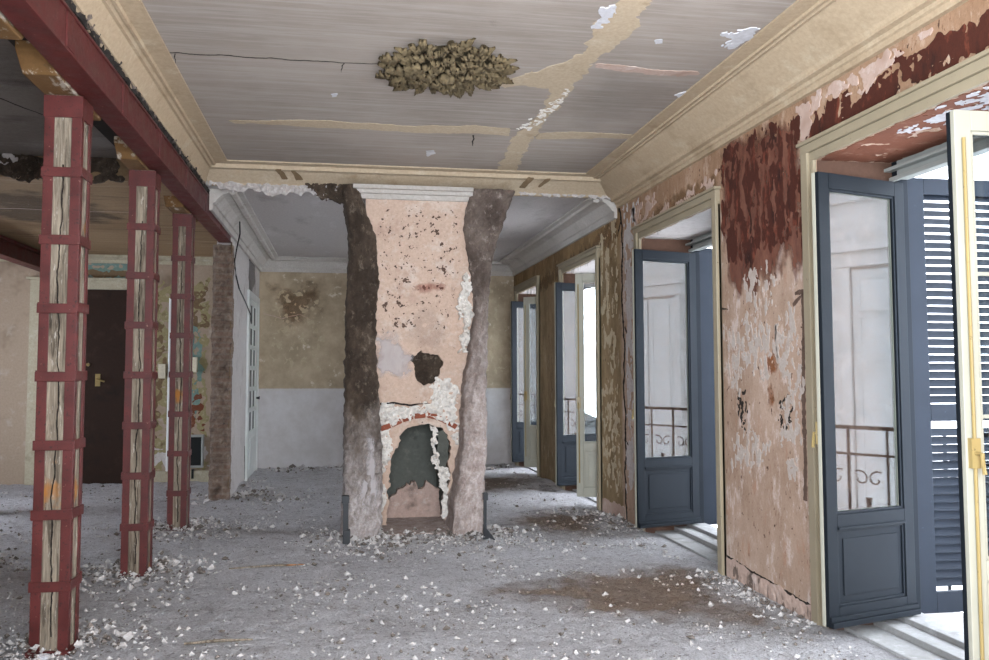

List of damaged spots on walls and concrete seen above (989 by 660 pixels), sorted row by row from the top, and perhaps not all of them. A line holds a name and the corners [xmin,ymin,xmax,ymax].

peeling [229,0,699,171]
flaking render [193,286,210,328]
peeling [599,9,989,495]
flaking render [191,388,206,431]
spalling [379,350,460,519]